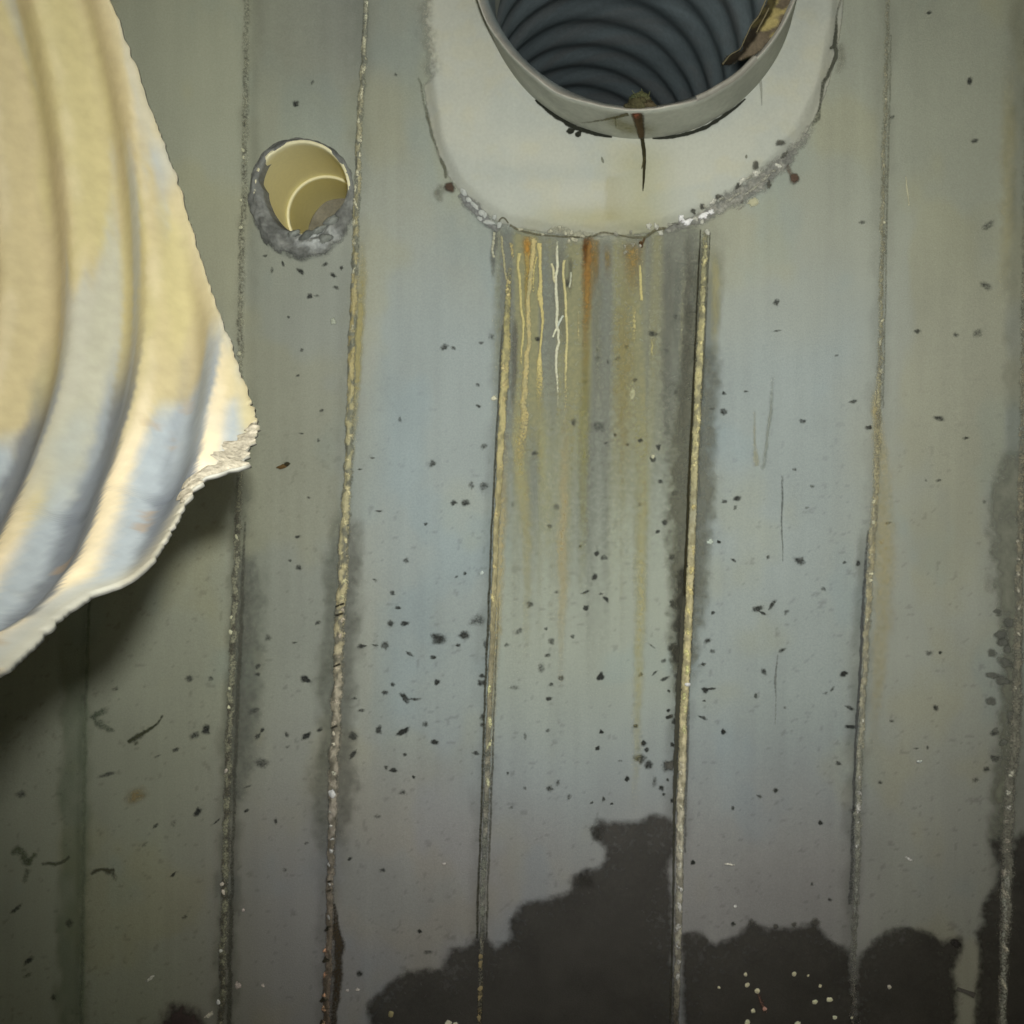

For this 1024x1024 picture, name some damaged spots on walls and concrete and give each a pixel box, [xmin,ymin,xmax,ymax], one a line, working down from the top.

crack [535,100,612,138]
crack [640,99,746,190]
crack [498,217,665,245]
corrosion [583,238,597,330]
leakage [458,133,809,733]
leakage [368,457,1024,1024]